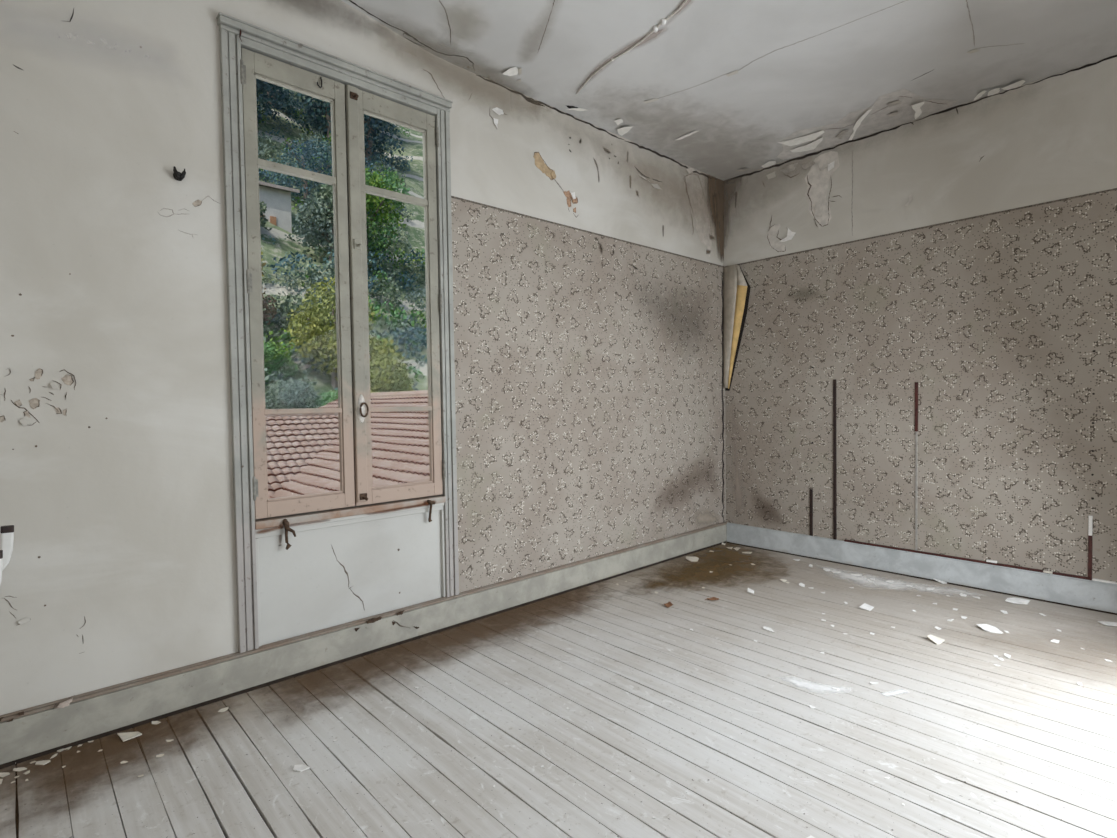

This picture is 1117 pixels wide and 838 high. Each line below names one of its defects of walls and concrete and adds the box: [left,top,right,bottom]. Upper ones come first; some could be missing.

crack [349,0,1117,236]
peeling [973,80,1025,101]
flaking render [533,152,578,217]
peeling [736,89,958,229]
flaking render [28,368,76,416]
crack [331,545,365,611]
water stain [644,543,776,588]